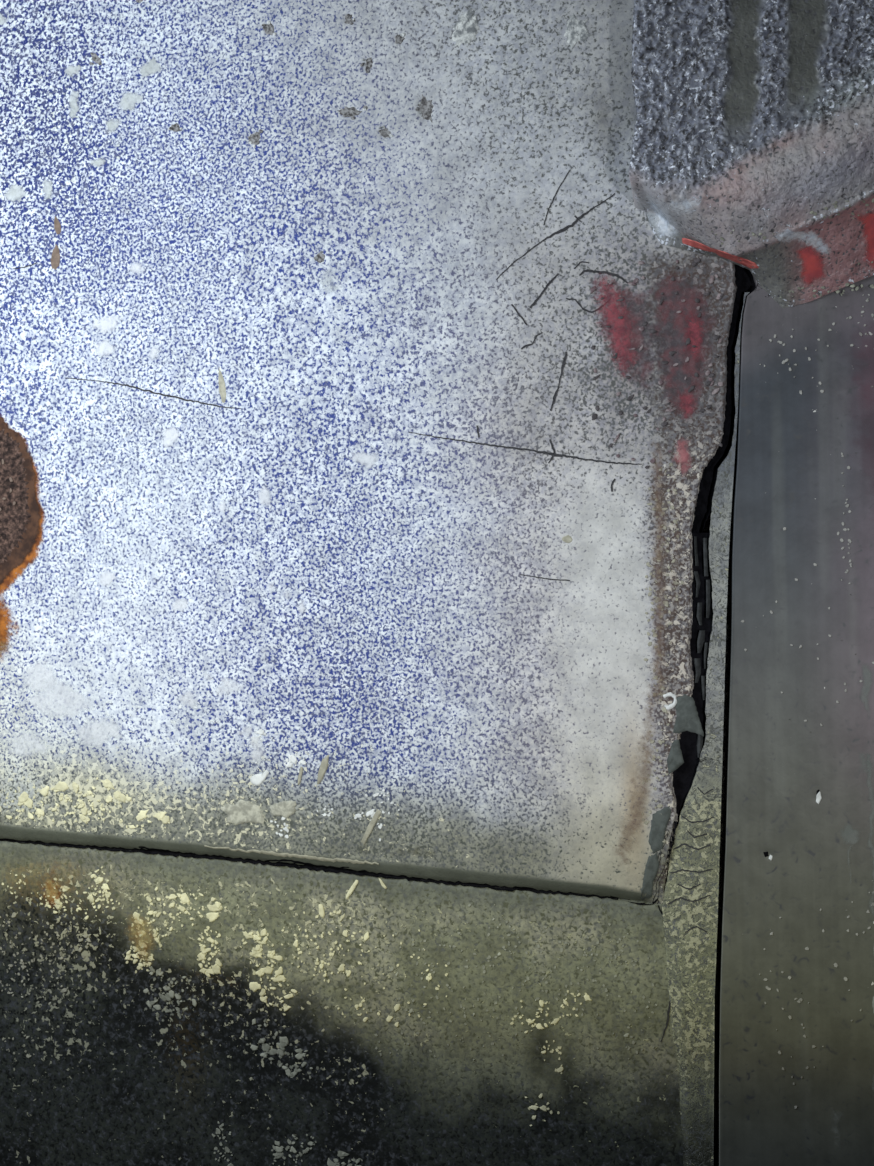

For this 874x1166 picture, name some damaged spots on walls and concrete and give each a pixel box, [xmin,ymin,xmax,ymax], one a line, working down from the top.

crack [496,170,615,280]
peeling [661,335,723,413]
corrosion [0,417,44,655]
crack [0,261,756,932]
spalling [608,434,711,900]